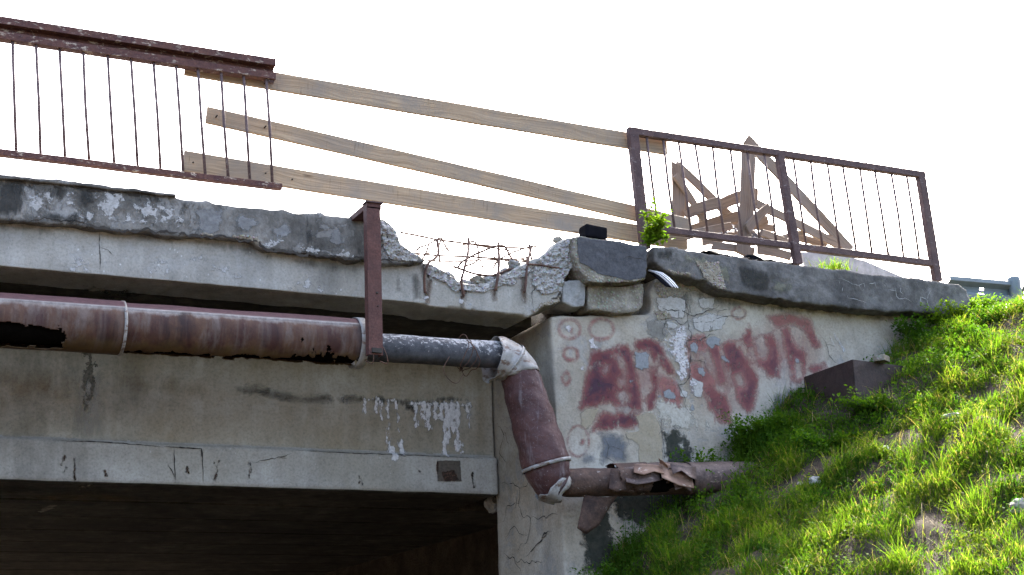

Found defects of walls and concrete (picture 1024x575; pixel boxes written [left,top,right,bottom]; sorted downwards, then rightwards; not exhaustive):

flaking render [25,189,184,227]
flaking render [195,209,223,240]
flaking render [232,216,291,248]
flaking render [300,228,354,261]
spalling [381,221,572,313]
flaking render [626,261,729,463]
damp [260,390,472,461]
crack [256,426,558,564]